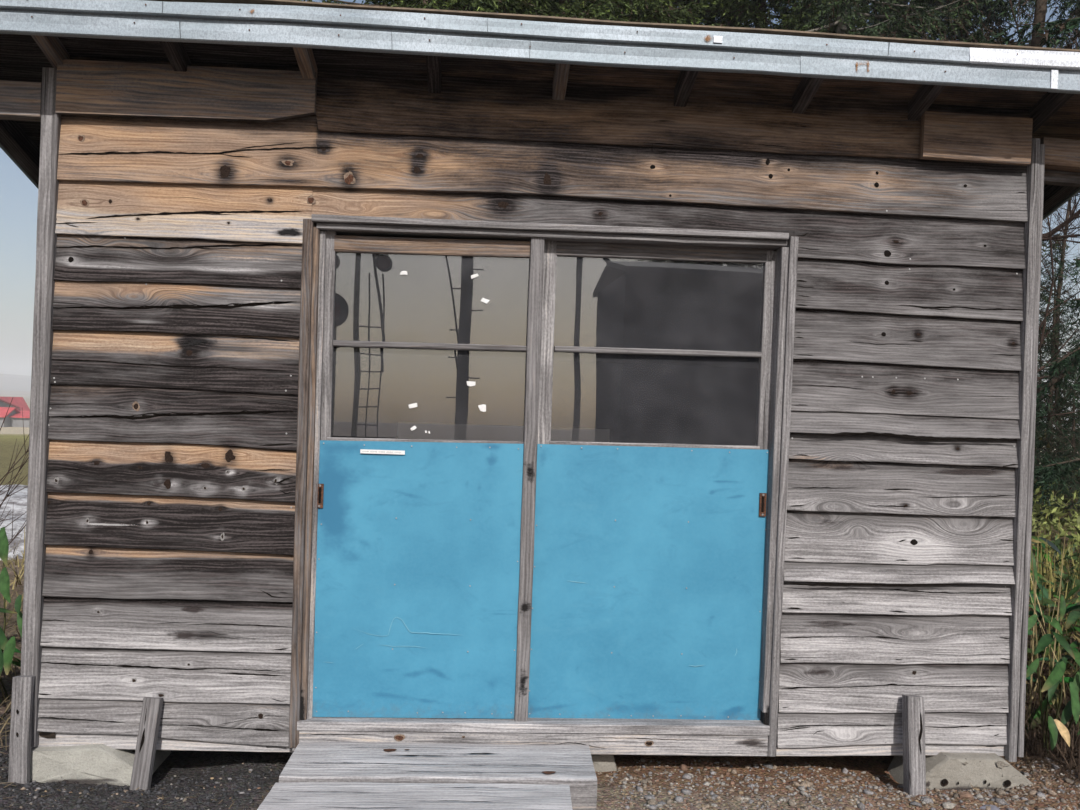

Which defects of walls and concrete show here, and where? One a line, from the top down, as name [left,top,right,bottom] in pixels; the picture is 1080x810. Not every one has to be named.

crack [67,141,335,157]
crack [56,210,303,249]